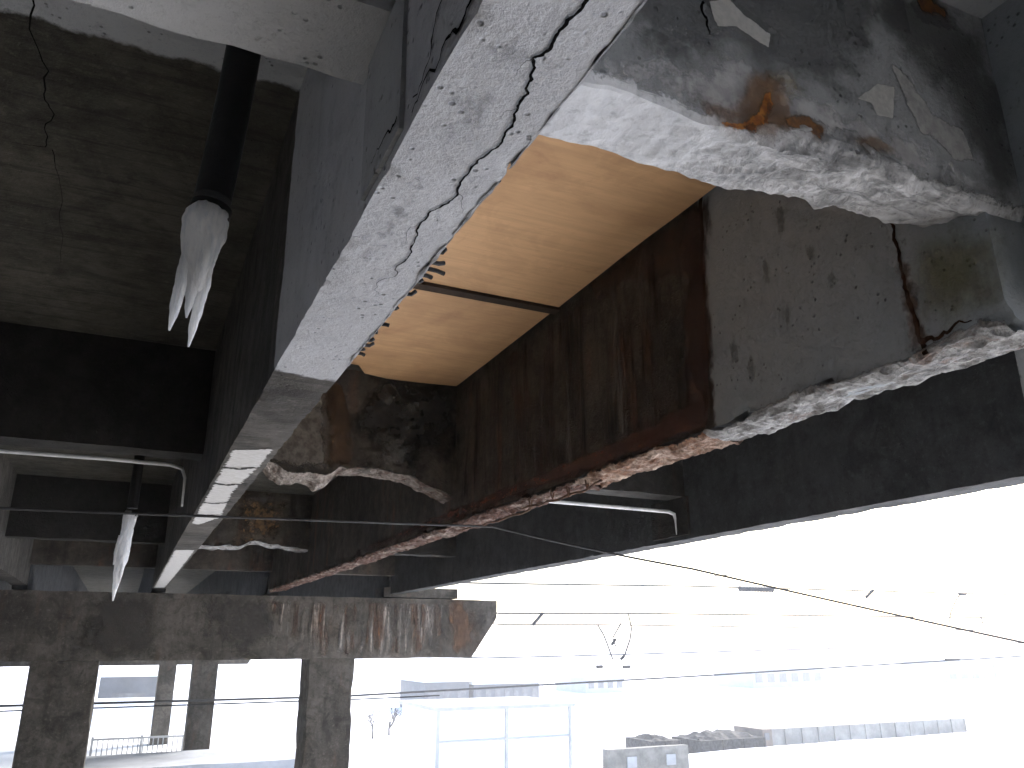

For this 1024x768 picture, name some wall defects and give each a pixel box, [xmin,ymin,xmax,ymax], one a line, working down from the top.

crack [12,0,63,258]
crack [371,0,589,294]
rust [706,75,824,140]
spalling [509,0,1024,228]
crack [890,223,972,355]
peeling [193,449,454,524]
damp [349,378,456,478]
spalling [269,319,1024,592]
peeling [155,540,308,588]